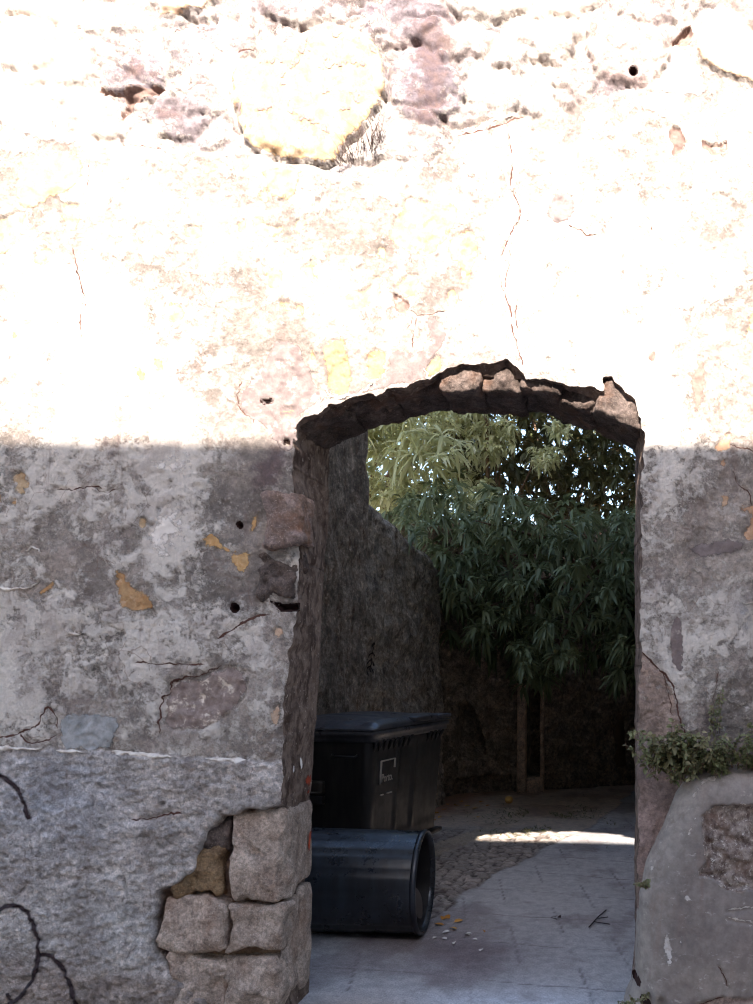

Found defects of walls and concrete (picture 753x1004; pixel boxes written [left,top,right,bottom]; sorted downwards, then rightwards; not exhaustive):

peeling [0,212,25,254]
crack [457,116,525,365]
crack [72,248,87,338]
spalling [239,316,446,451]
crack [730,444,753,505]
peeling [115,571,153,611]
crack [217,614,270,639]
crack [0,706,58,744]
crack [136,661,222,733]
crack [642,652,686,733]